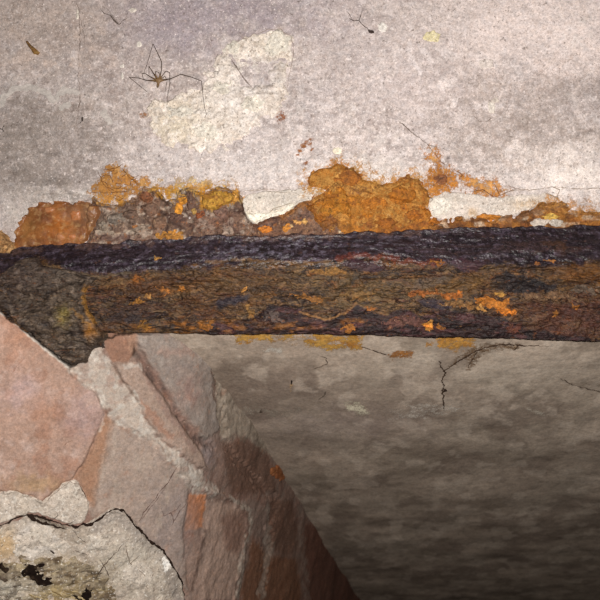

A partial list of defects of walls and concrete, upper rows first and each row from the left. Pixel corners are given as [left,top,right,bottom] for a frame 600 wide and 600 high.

spalling [147,28,296,154]
rust [0,230,16,253]
rust [87,161,244,212]
rust [155,229,184,240]
spalling [86,186,344,244]
rust [423,146,519,198]
peeling [428,191,557,220]
rust [0,308,28,332]
rust [77,259,600,352]
rust [388,350,413,358]
crack [438,343,553,409]